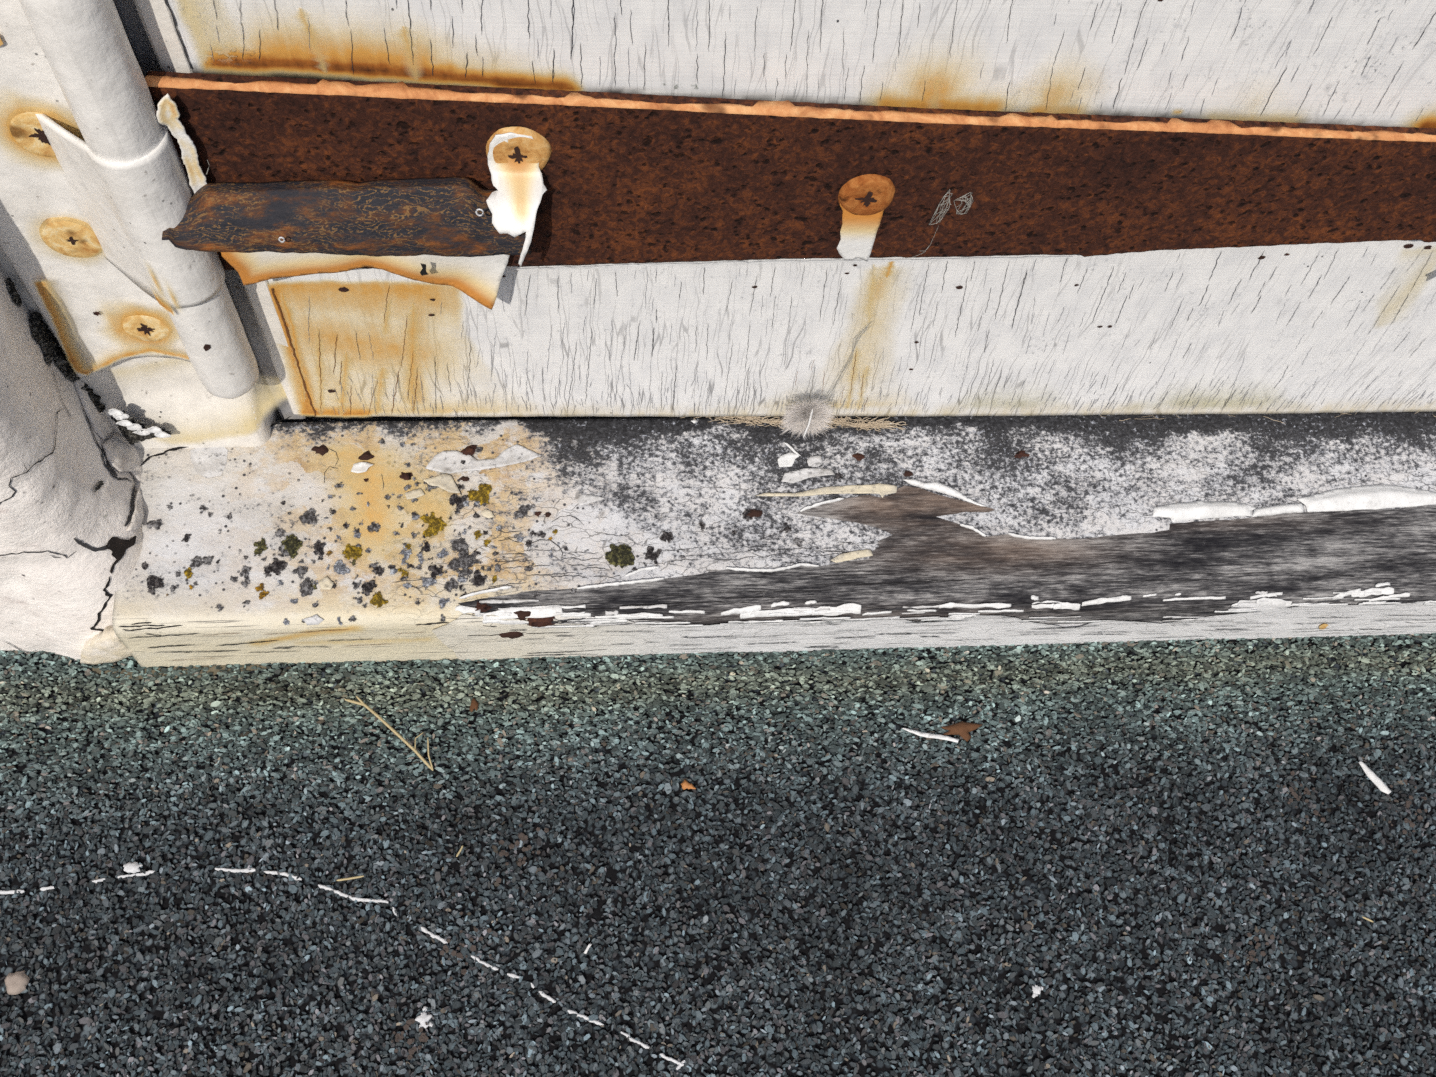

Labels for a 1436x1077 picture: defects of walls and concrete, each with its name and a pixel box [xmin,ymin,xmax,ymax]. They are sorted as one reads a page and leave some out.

rust [0,101,85,164]
rust [178,0,582,91]
rust [874,69,1006,112]
rust [1026,82,1082,114]
rust [1409,113,1436,128]
peeling [156,93,547,310]
rust [34,272,190,375]
rust [168,281,460,443]
crack [0,373,607,661]
spalling [0,442,1436,1077]